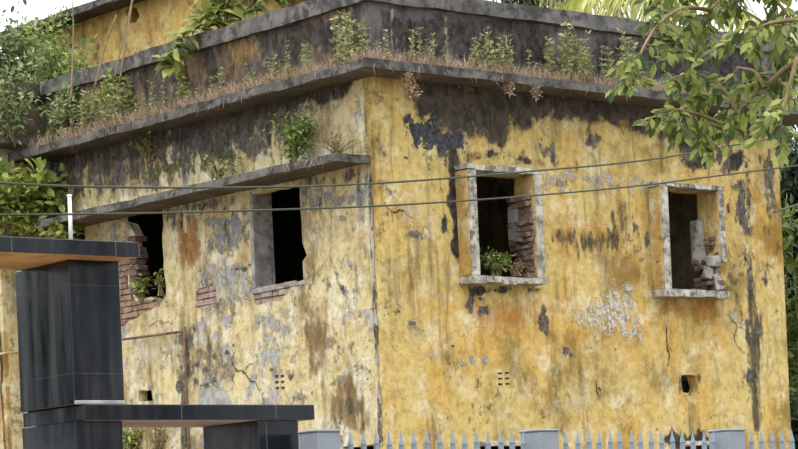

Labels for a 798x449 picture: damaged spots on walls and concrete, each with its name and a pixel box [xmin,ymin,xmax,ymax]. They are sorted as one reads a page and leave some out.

damp [202,47,217,88]
damp [271,12,358,69]
damp [404,80,775,259]
corrosion [176,216,200,265]
flaking render [196,208,297,345]
damp [304,303,325,374]
damp [465,285,512,316]
damp [537,304,549,339]
peeling [566,277,647,345]
damp [735,244,768,431]
crack [231,352,259,390]
damp [330,374,368,433]